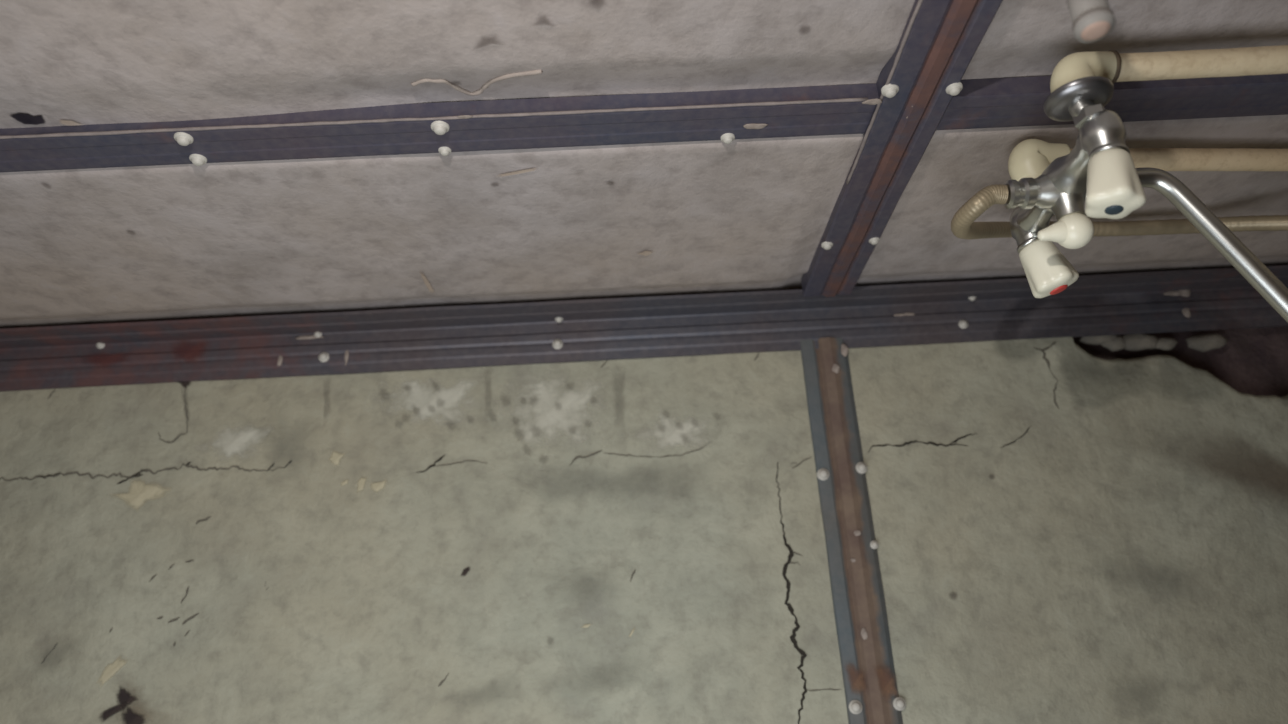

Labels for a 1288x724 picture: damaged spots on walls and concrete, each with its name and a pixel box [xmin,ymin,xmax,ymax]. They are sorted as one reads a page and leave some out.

crack [1035,342,1059,409]
leakage [393,381,472,423]
leakage [513,379,597,442]
crack [0,389,292,484]
leakage [212,428,270,457]
crack [415,454,483,473]
crack [569,441,712,466]
leakage [638,416,707,448]
crack [869,428,1029,451]
crack [776,457,841,724]